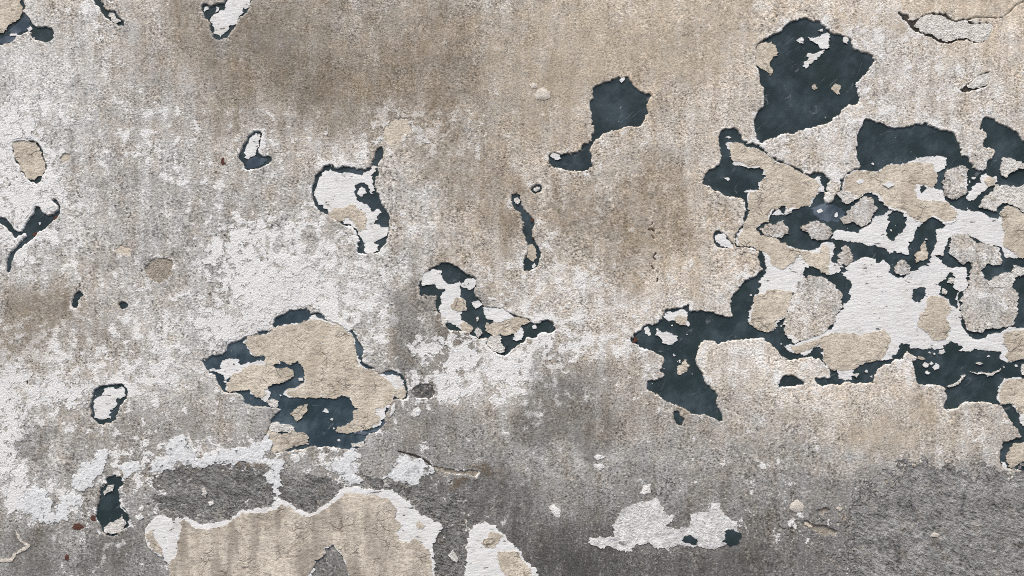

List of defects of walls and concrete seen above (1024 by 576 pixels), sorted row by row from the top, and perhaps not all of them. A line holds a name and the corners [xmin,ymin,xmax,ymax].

peeling [0,0,54,45]
peeling [202,0,252,40]
peeling [549,77,651,172]
peeling [0,199,60,273]
peeling [312,118,413,254]
peeling [511,185,542,271]
peeling [419,263,556,356]
peeling [631,18,1024,576]
peeling [91,384,128,425]
peeling [203,308,435,463]
peeling [96,461,539,576]
peeling [588,484,742,552]